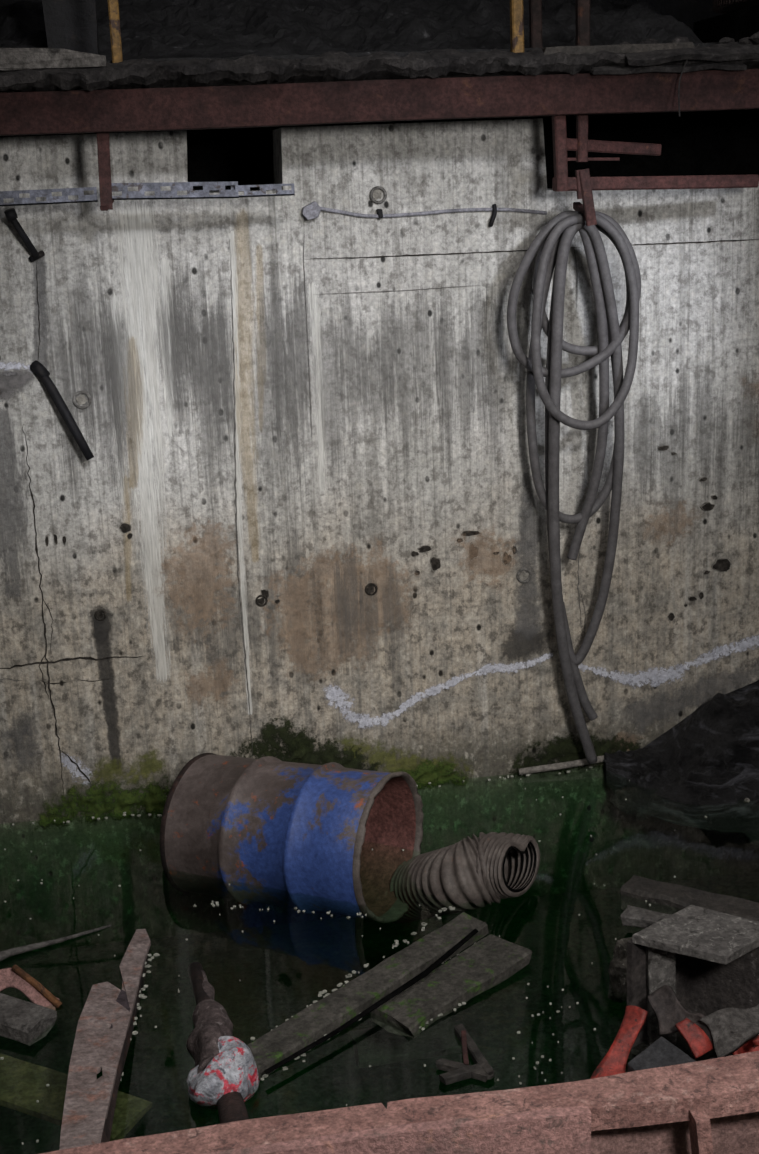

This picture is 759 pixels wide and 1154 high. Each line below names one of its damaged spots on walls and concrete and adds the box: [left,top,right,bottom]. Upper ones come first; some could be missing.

damp [112,202,175,681]
damp [229,231,252,714]
damp [309,283,325,492]
damp [61,753,93,785]
damp [90,606,121,769]
damp [324,476,554,728]